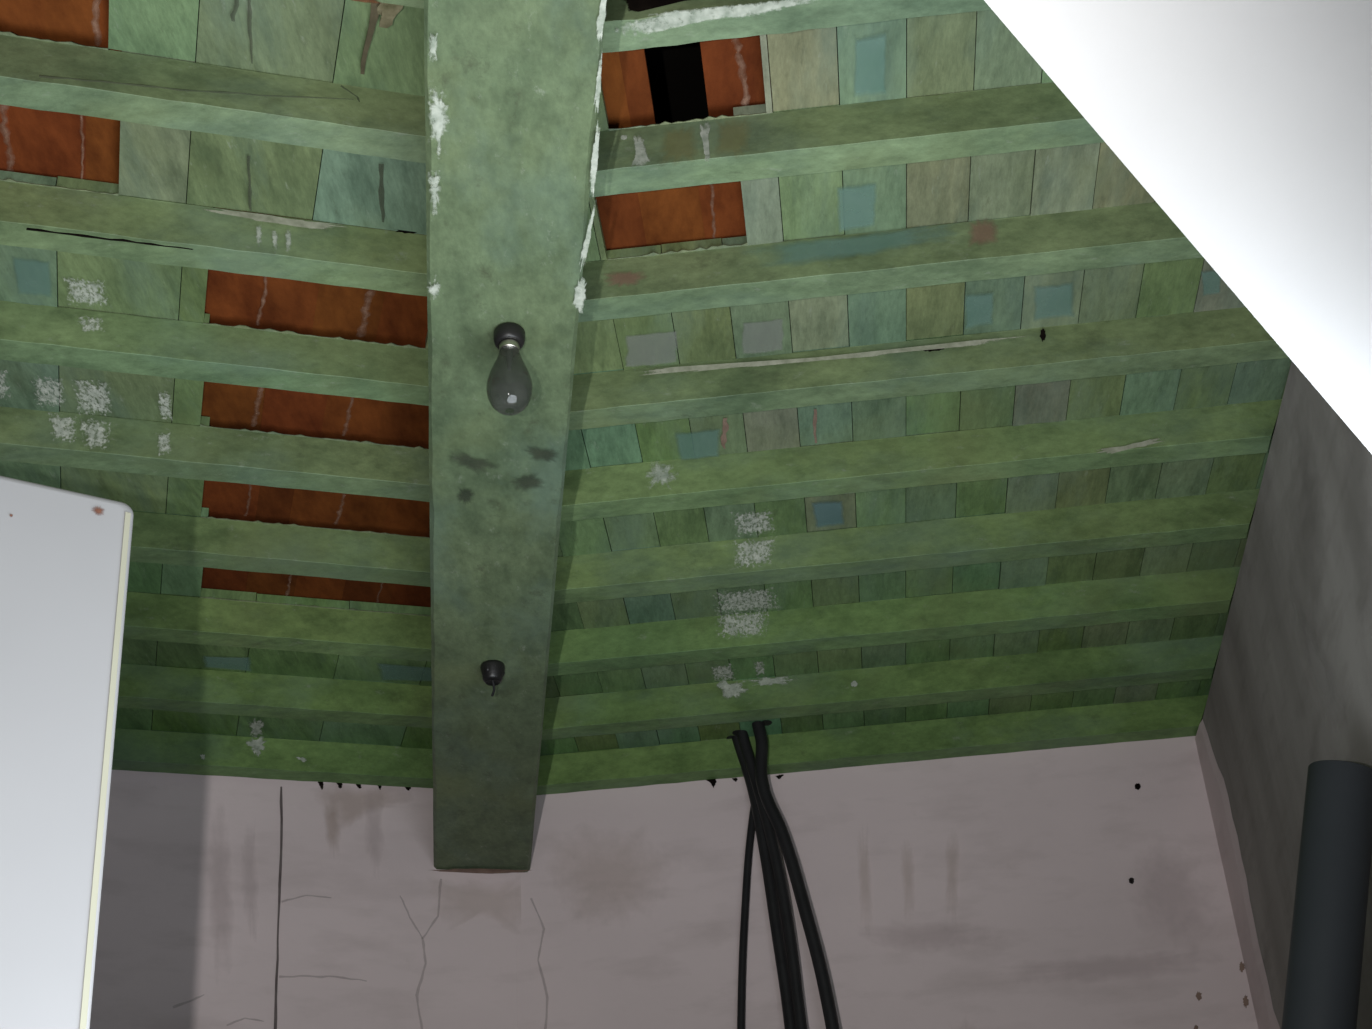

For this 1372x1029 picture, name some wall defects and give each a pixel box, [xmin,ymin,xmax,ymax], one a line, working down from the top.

peeling [0,0,122,52]
peeling [0,104,120,196]
peeling [574,0,807,312]
peeling [428,176,439,213]
peeling [203,269,439,349]
peeling [200,382,429,450]
peeling [201,480,430,538]
peeling [200,567,431,616]